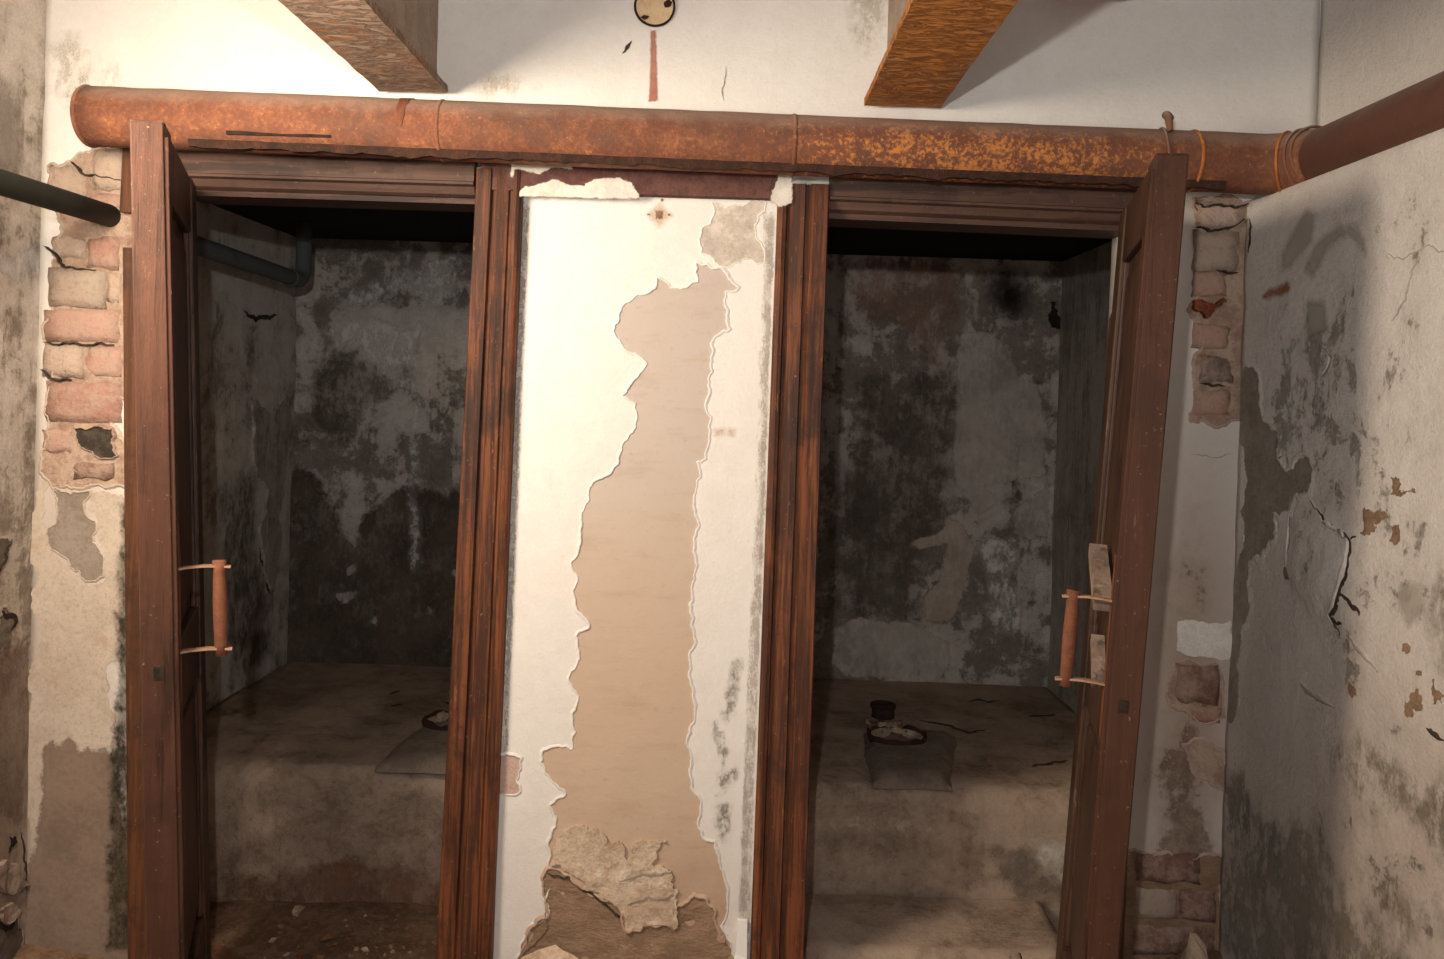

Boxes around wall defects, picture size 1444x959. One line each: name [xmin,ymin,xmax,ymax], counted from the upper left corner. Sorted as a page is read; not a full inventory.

corrosion [396,98,415,126]
flaking render [38,147,132,583]
leakage [287,256,461,667]
flaking render [499,200,767,959]
leakage [836,372,958,615]
flaking render [1164,193,1317,792]
crack [1285,497,1360,635]
flaking render [1360,507,1400,545]
flaking render [1404,670,1444,718]
flaking render [0,836,29,959]
leakage [1222,774,1392,959]
leakage [1348,746,1444,846]